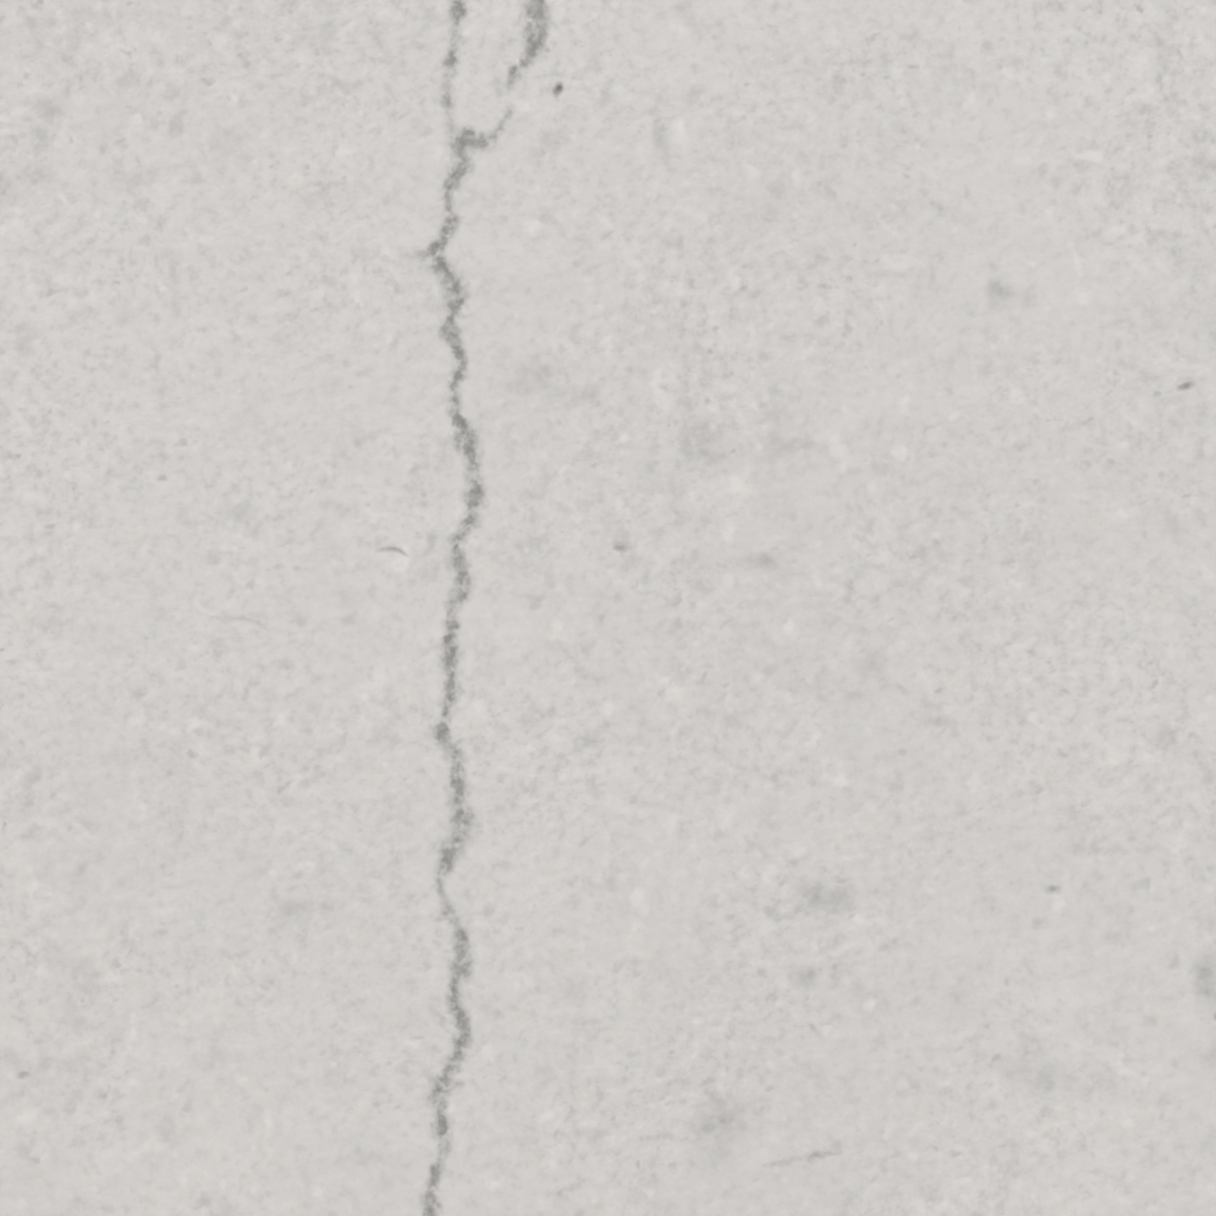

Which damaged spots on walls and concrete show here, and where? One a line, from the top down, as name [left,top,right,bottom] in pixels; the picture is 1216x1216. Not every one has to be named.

crack [373,542,411,559]
crack [399,0,555,1216]